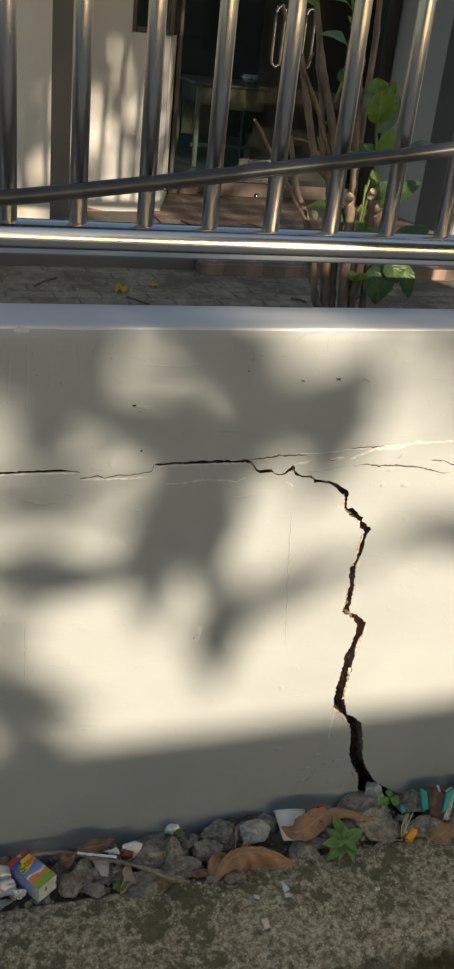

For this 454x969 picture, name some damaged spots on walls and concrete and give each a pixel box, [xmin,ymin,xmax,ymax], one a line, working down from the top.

crack [0,454,454,793]